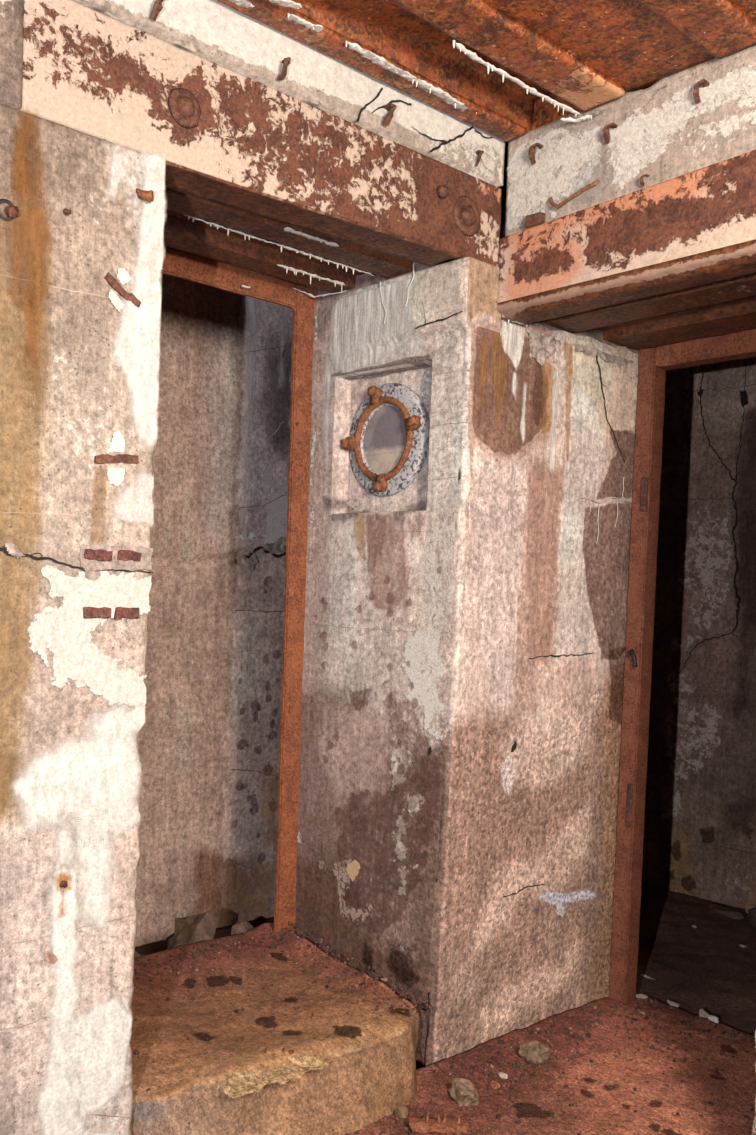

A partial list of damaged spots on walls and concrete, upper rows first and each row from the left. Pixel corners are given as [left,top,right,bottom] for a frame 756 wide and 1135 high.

leakage [107,152,126,196]
crack [356,88,492,152]
leakage [114,153,165,447]
leakage [240,285,258,540]
leakage [185,215,422,486]
leakage [500,315,534,442]
leakage [549,371,558,475]
crack [566,356,630,544]
crack [0,542,153,580]
crack [236,546,286,561]
crack [665,363,756,686]
peeling [27,564,151,707]